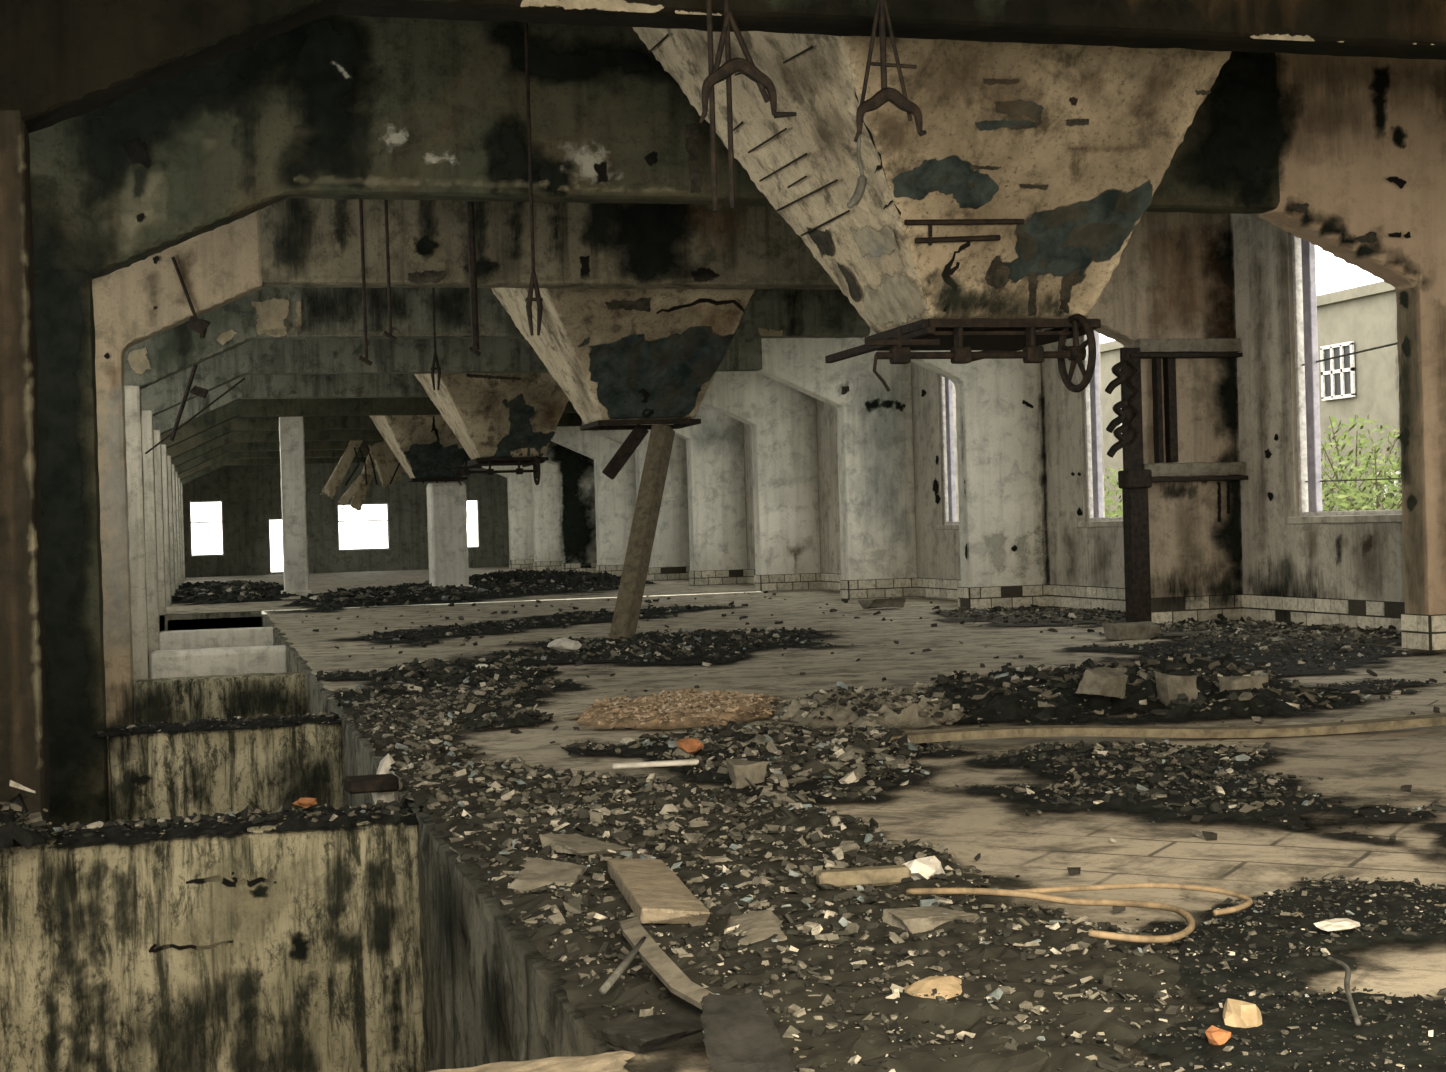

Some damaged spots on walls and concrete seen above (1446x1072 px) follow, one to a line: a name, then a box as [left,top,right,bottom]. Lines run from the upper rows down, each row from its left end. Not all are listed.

damp [386,127,406,144]
damp [575,146,606,177]
spalling [759,153,838,212]
damp [414,200,439,257]
spalling [408,270,446,283]
spalling [579,256,590,280]
damp [582,203,698,283]
flaking render [801,155,1153,326]
flaking render [578,268,752,419]
damp [326,862,396,961]
damp [40,861,317,1072]
damp [391,971,401,1052]